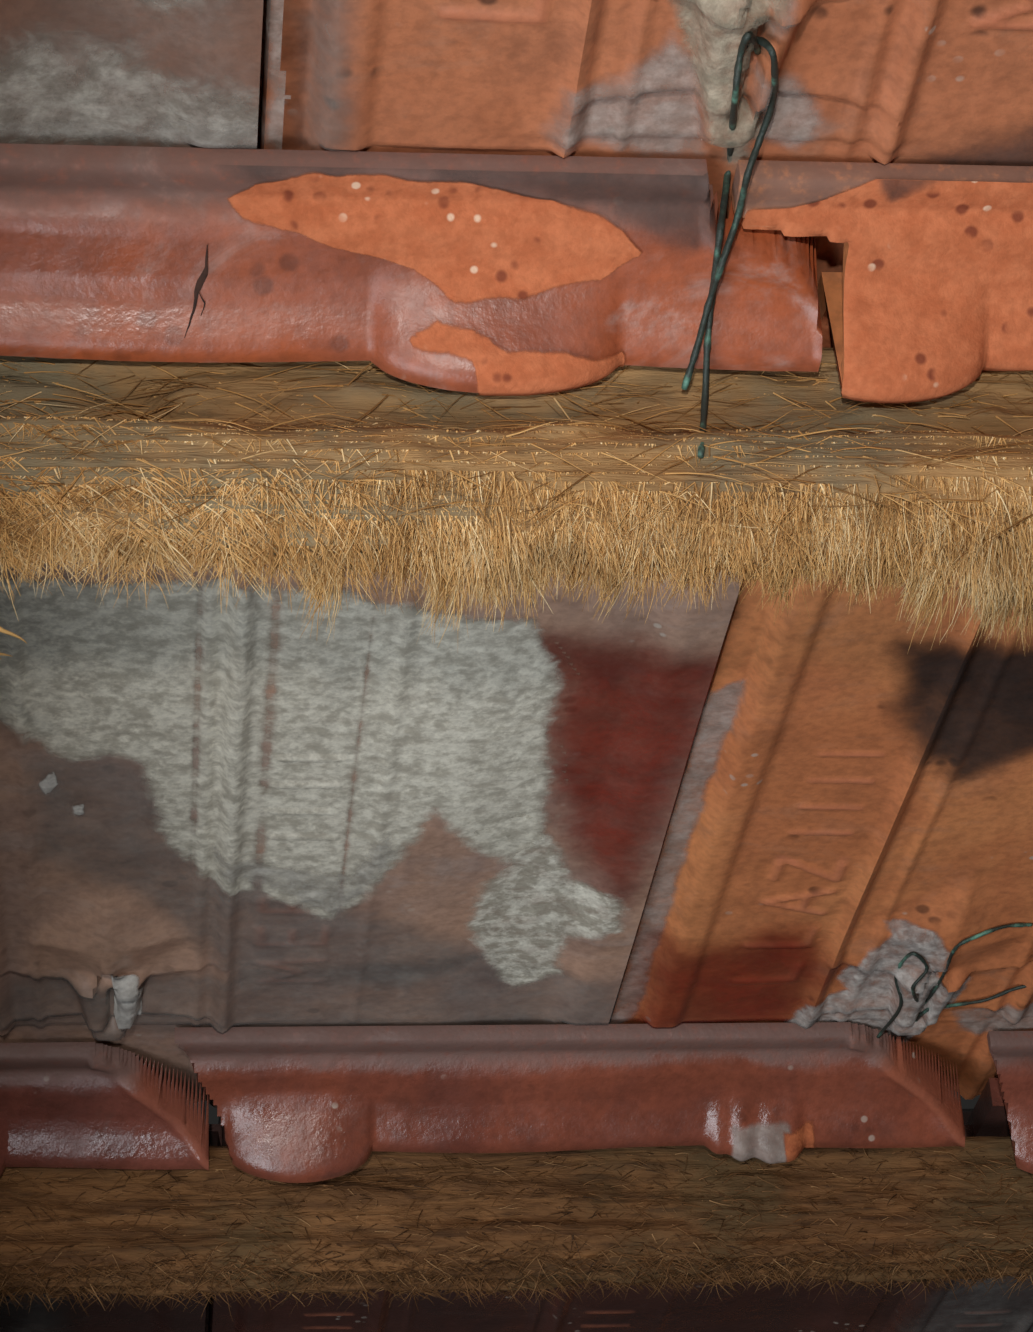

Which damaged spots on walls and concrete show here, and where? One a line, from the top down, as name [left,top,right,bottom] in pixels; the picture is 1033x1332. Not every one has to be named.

damp [0,0,291,148]
spalling [228,173,641,303]
spalling [410,321,625,396]
spalling [742,179,1033,403]
damp [0,577,621,985]
damp [105,975,143,1029]